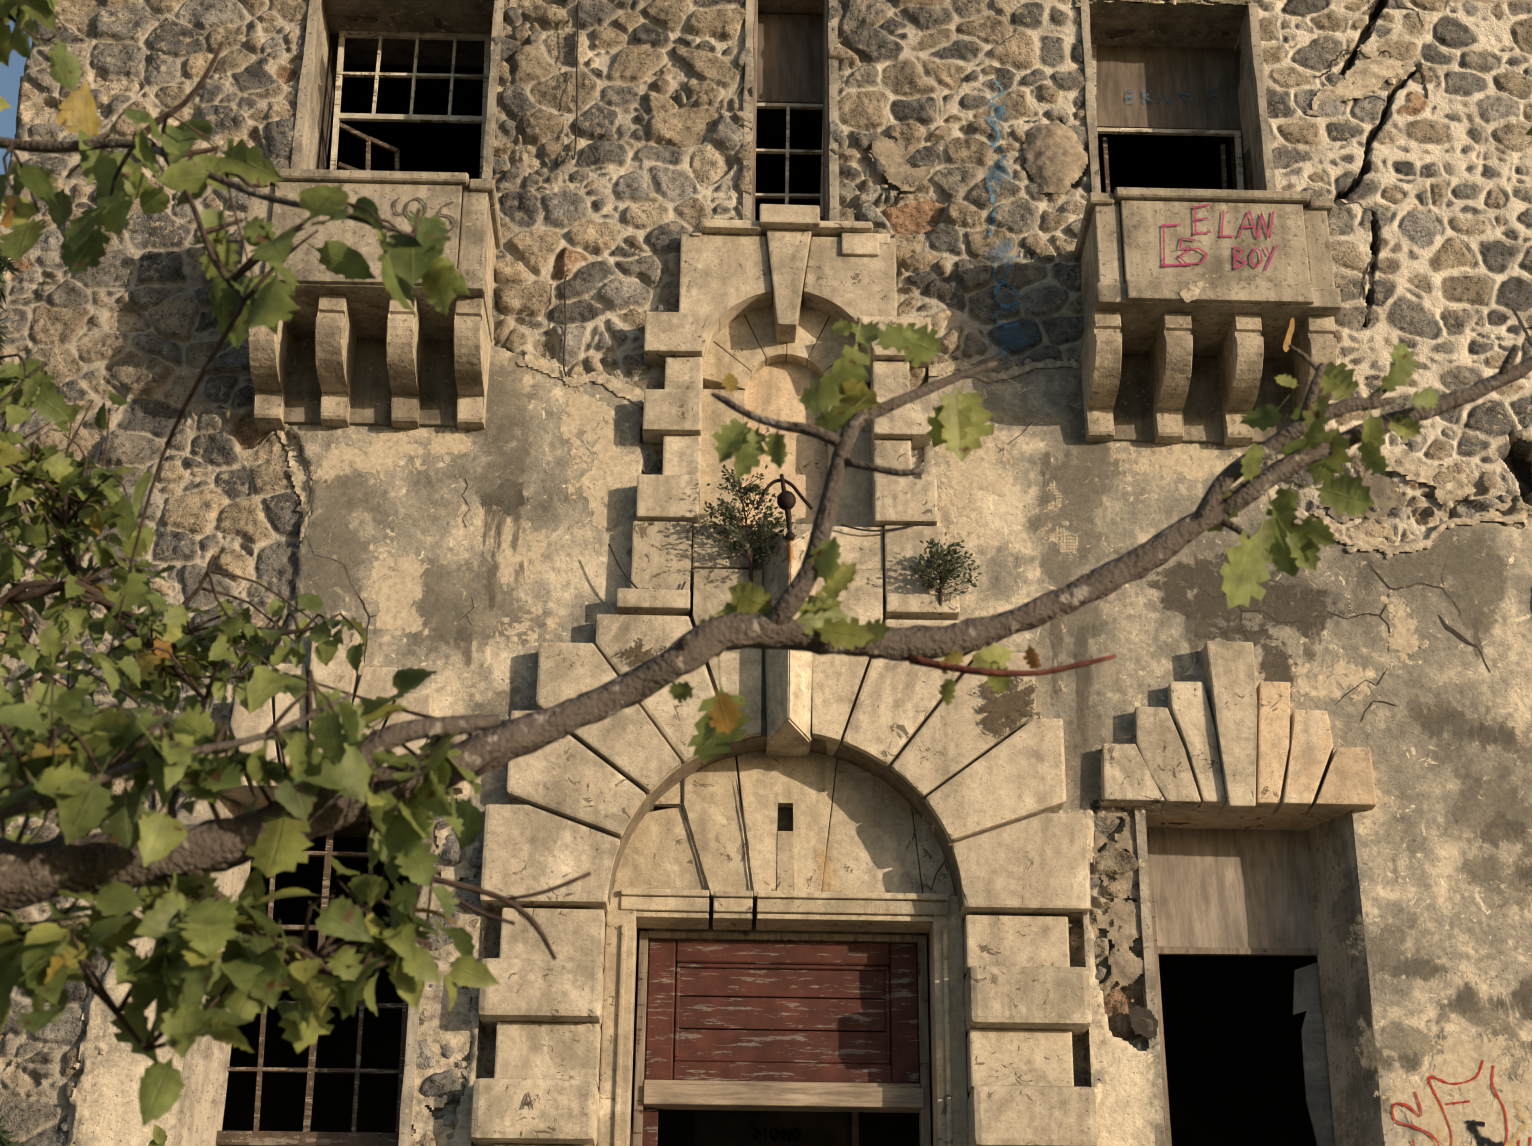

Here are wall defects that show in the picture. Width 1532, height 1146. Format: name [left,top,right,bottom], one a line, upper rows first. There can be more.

crack [1306,0,1428,325]
water stain [479,479,532,609]
peeling [1313,440,1528,559]
peeling [1515,424,1532,442]
water stain [455,626,472,666]
water stain [1147,553,1351,701]
crack [1194,563,1491,722]
crack [1311,748,1334,806]
crack [653,778,713,915]
crack [736,780,755,915]
crack [930,858,948,892]
peeling [1093,803,1153,1031]